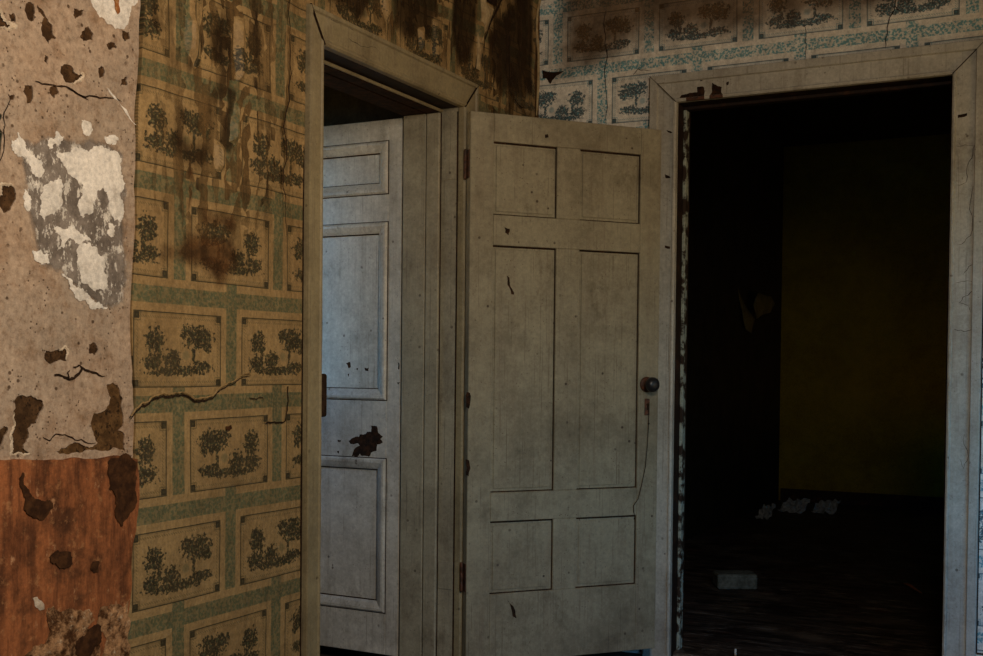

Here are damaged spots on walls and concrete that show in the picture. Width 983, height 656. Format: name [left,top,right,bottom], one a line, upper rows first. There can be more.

water stain [337,0,533,117]
crack [36,81,136,125]
water stain [175,0,284,281]
peeling [0,120,126,309]
spalling [0,395,43,457]
crack [54,365,104,381]
spalling [57,383,124,454]
crack [130,373,289,424]